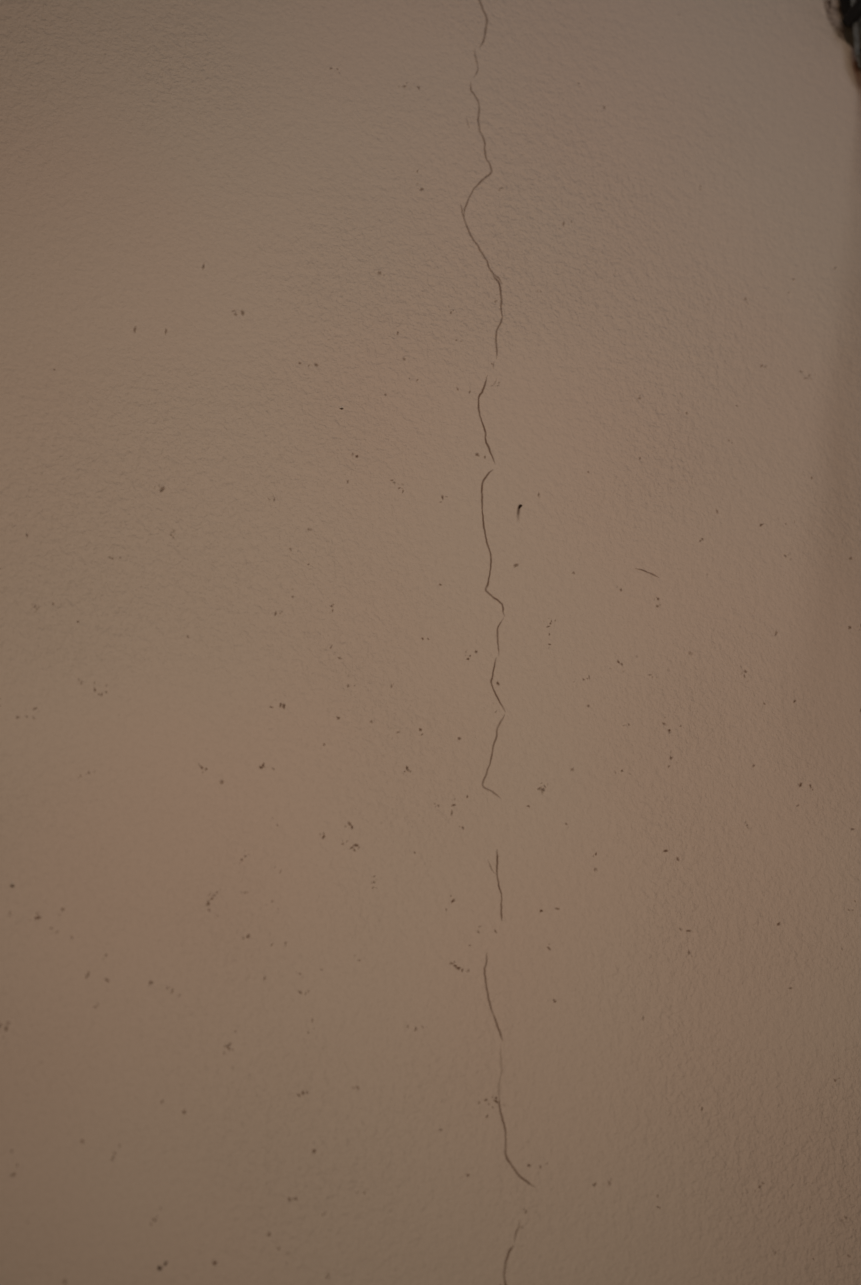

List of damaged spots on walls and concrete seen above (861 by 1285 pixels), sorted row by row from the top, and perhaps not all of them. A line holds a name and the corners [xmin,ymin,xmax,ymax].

crack [478,382,504,634]